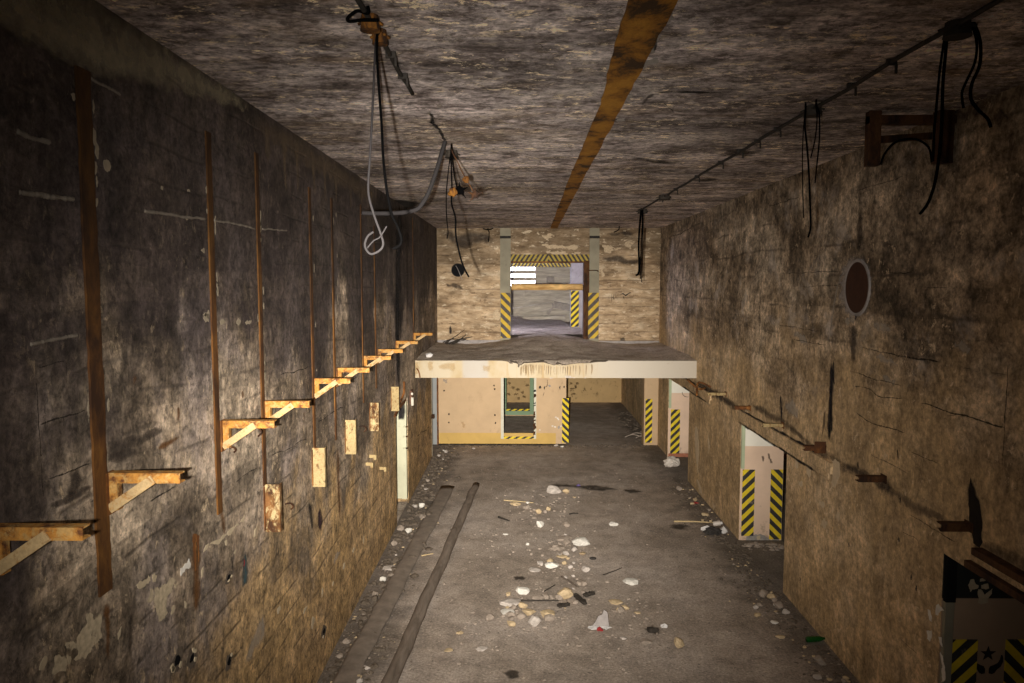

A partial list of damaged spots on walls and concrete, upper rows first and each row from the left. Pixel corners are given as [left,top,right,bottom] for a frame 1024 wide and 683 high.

crack [863,347,938,362]
spalling [508,359,608,378]
crack [854,367,1008,471]